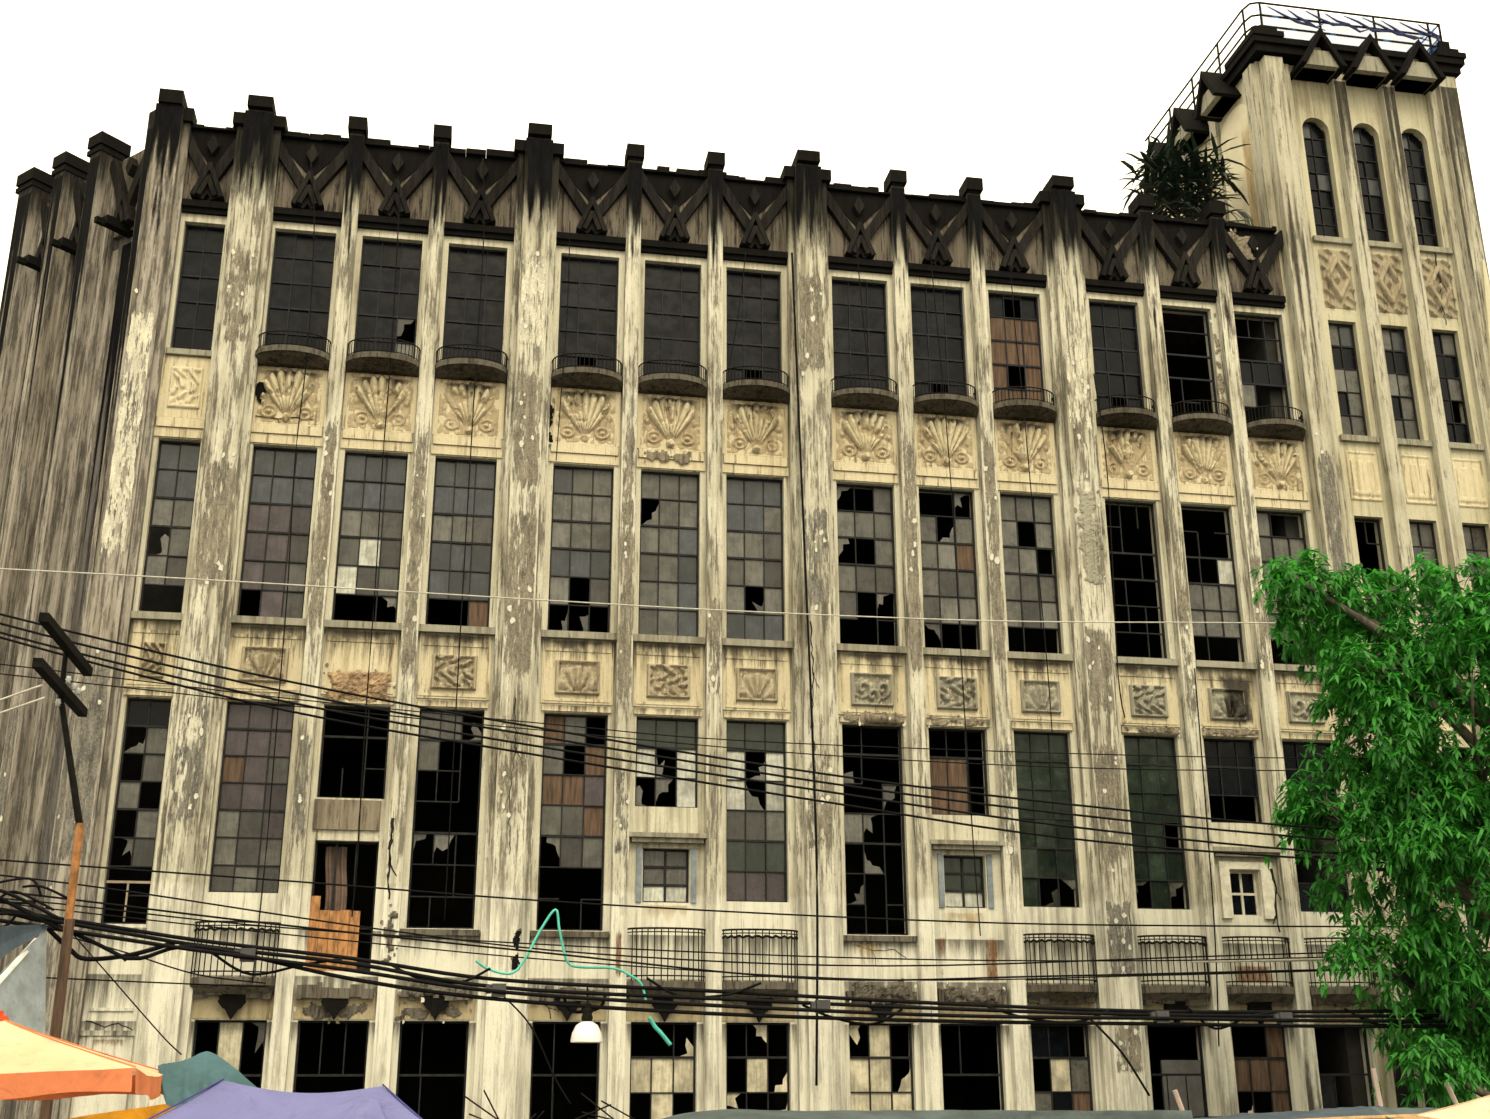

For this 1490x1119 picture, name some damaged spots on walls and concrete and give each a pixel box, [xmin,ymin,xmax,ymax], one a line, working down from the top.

water stain [0,174,64,545]
water stain [25,155,100,642]
peeling [101,288,155,563]
water stain [796,164,822,241]